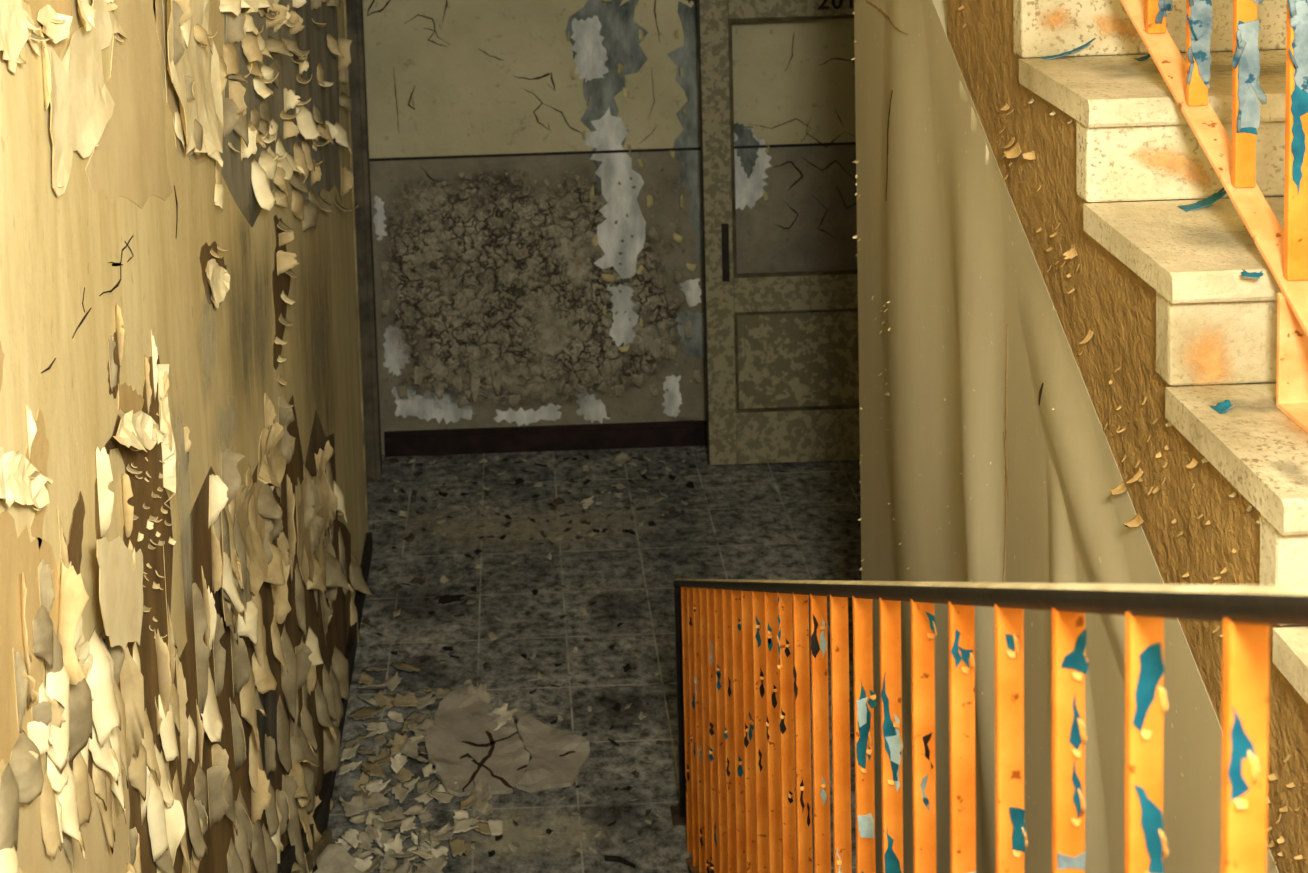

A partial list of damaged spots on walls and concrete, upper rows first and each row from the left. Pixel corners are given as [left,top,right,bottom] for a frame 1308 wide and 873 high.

crack [367,0,582,133]
crack [639,0,660,144]
peeling [373,195,387,242]
peeling [381,0,705,426]
crack [41,235,134,373]
peeling [0,0,372,873]